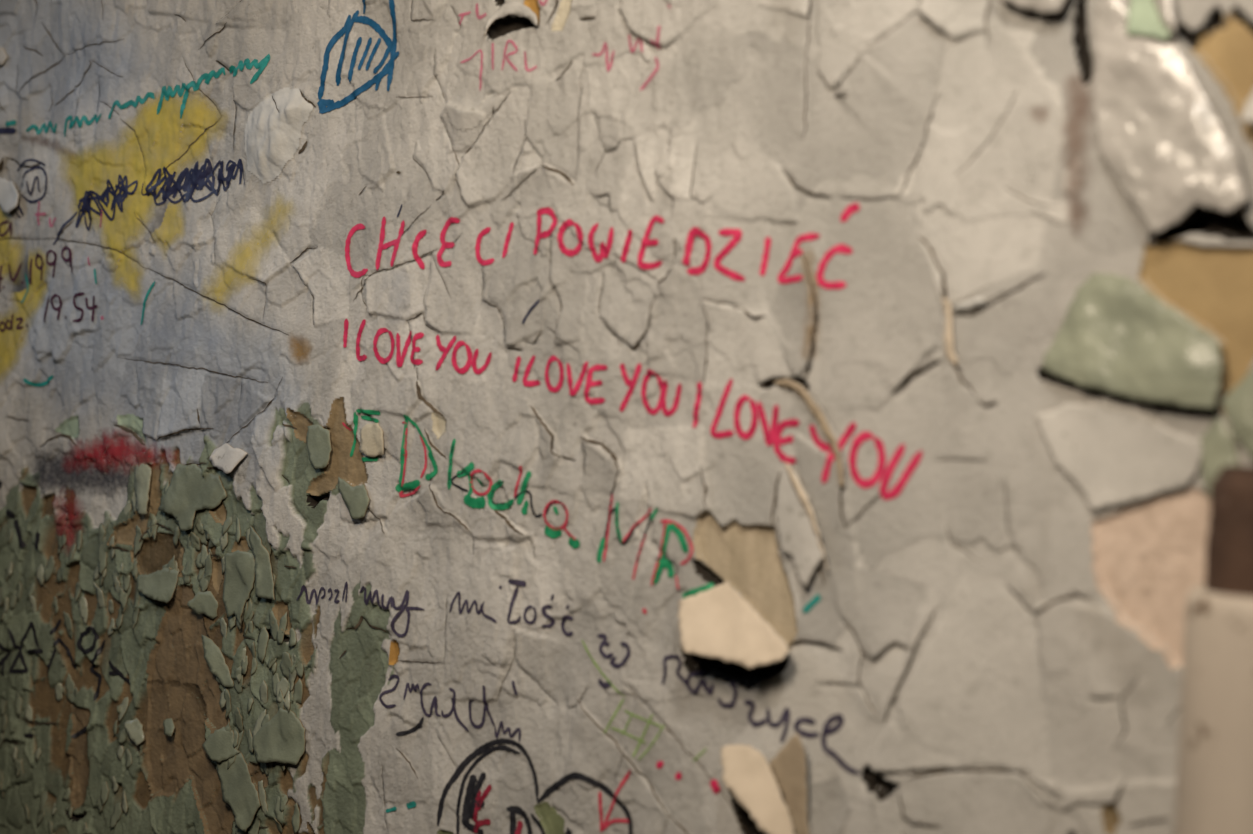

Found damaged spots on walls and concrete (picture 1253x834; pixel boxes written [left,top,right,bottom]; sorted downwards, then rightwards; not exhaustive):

crack [0,0,242,179]
peeling [483,0,572,37]
crack [0,213,317,335]
crack [113,357,297,474]
flaking render [286,397,384,520]
crack [353,53,713,543]
crack [757,246,818,402]
crack [893,360,997,407]
peeling [1034,0,1253,669]
flaking render [0,443,315,834]
flaking render [389,640,400,665]
flaking render [677,461,829,669]